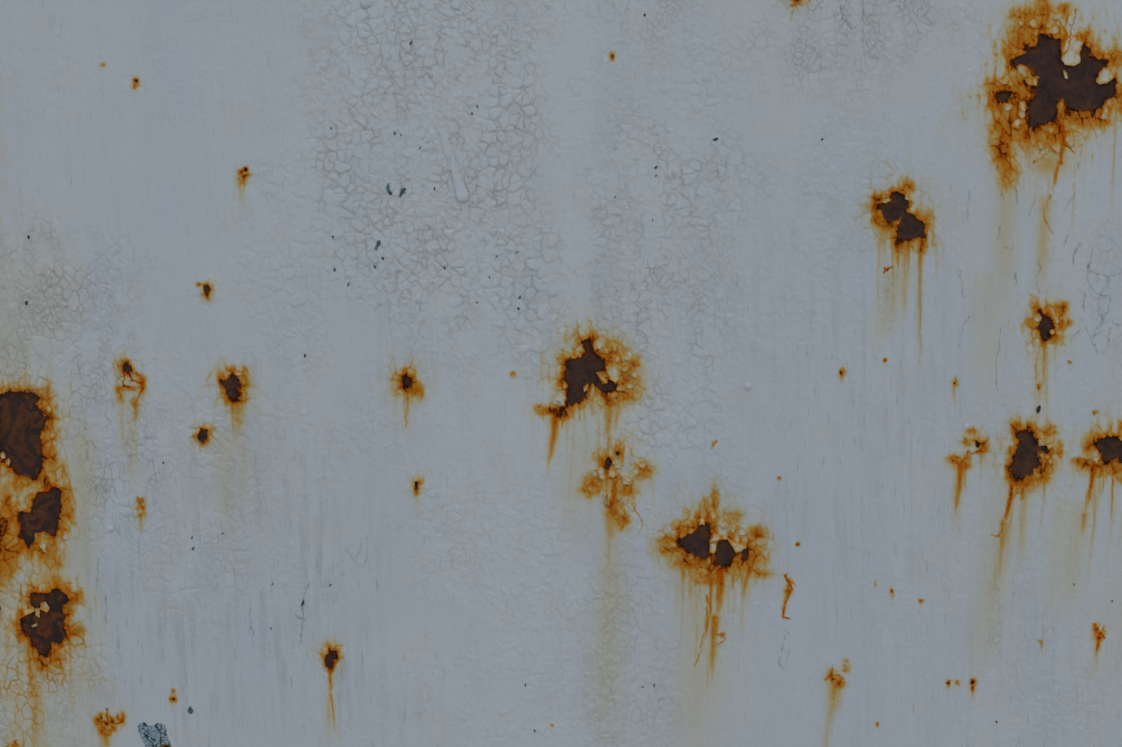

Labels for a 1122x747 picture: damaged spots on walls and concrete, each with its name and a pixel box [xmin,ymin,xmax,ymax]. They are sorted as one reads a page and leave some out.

corrosion [988,4,1122,177]
corrosion [872,184,927,252]
corrosion [1034,304,1068,346]
corrosion [219,369,246,405]
corrosion [539,335,637,438]
corrosion [0,388,70,572]
corrosion [1005,423,1061,509]
corrosion [1077,423,1122,488]
corrosion [664,504,762,586]
corrosion [16,585,78,670]
corrosion [324,647,339,671]
peeling [138,722,179,747]